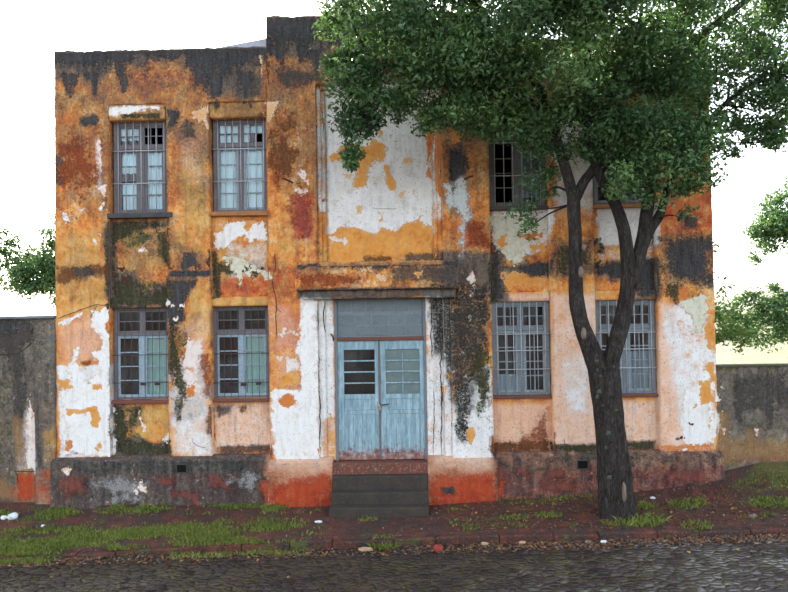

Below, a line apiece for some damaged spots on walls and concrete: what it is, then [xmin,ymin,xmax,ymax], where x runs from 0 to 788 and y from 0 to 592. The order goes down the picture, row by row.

damp [54,17,378,108]
damp [56,218,264,385]
peeling [213,220,273,286]
peeling [328,208,437,265]
damp [297,149,509,444]
peeling [487,213,548,291]
damp [639,215,714,304]
damp [2,345,36,474]
peeling [56,304,117,457]
damp [108,405,173,456]
peeling [219,299,336,456]
peeling [655,285,723,451]